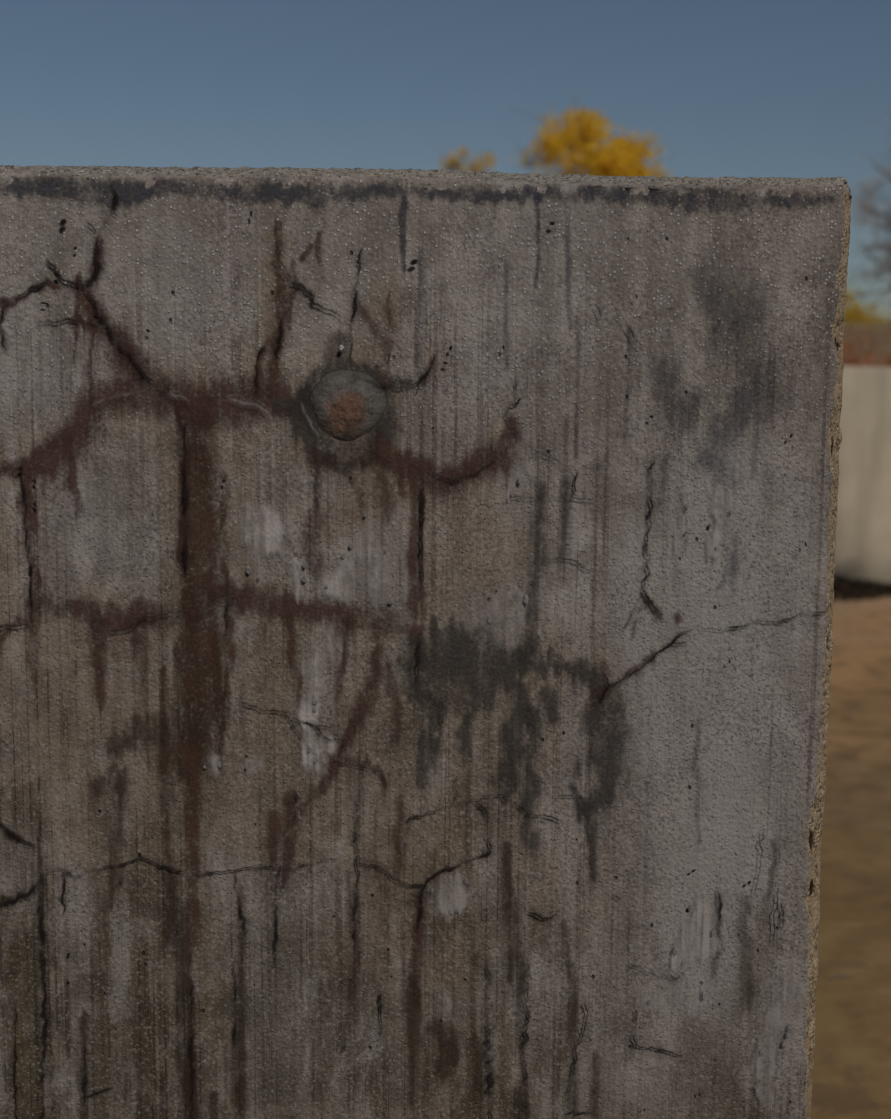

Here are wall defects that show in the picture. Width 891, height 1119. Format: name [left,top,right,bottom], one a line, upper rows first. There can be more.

crack [0,185,155,384]
leakage [7,177,190,206]
leakage [210,183,407,272]
crack [275,219,362,359]
leakage [424,184,560,242]
leakage [0,239,411,559]
crack [0,470,33,629]
leakage [361,405,518,642]
crack [419,462,492,579]
crack [625,459,660,627]
leakage [211,580,391,793]
crack [600,611,825,701]